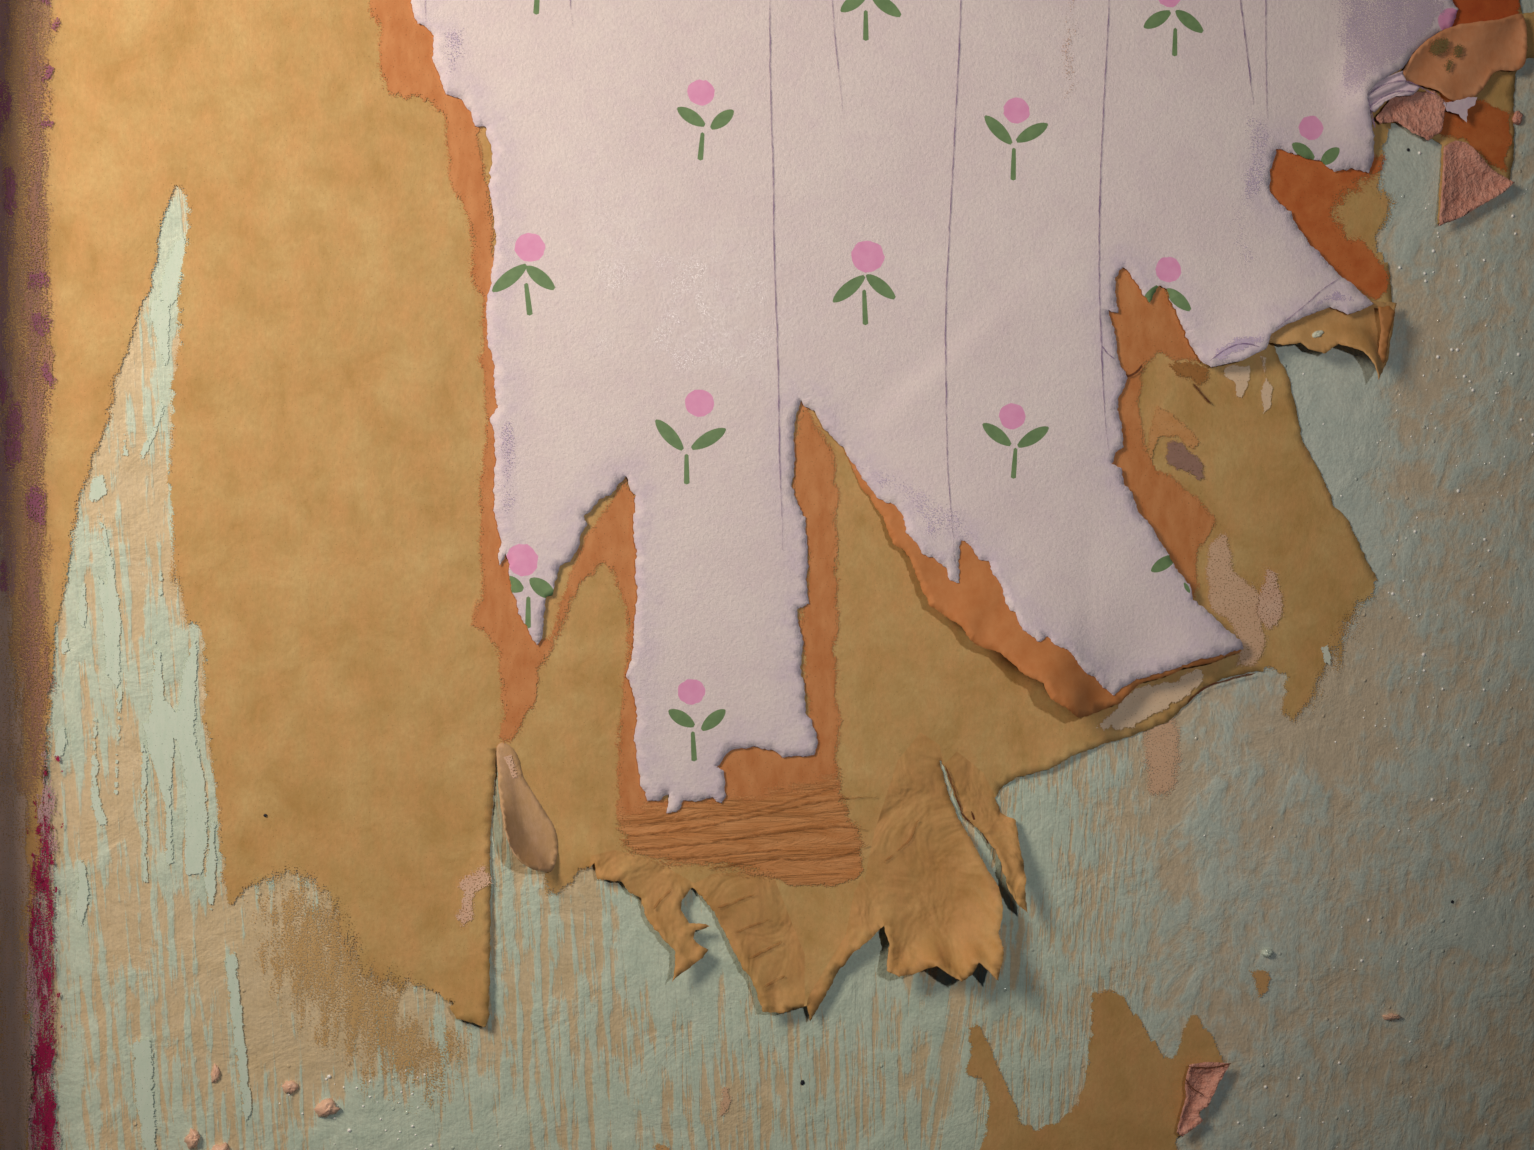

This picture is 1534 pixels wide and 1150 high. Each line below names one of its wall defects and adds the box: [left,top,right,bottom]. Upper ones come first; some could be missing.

peeling [1224,301,1397,413]
flaking render [1321,645,1331,665]
flaking render [1096,669,1204,731]